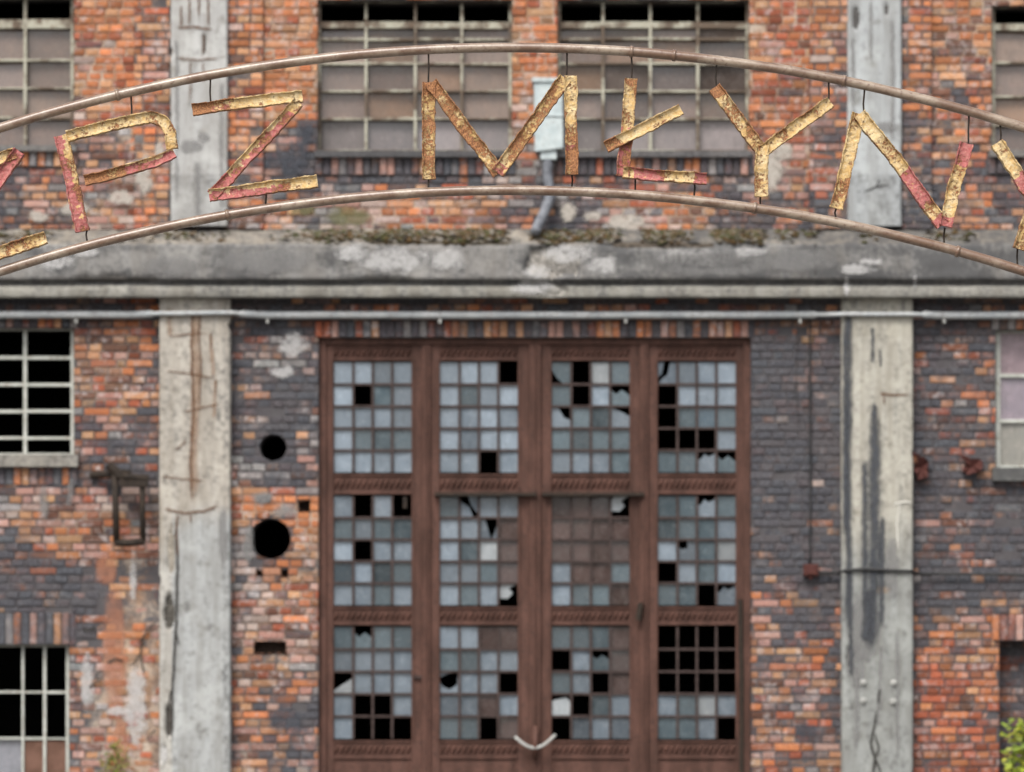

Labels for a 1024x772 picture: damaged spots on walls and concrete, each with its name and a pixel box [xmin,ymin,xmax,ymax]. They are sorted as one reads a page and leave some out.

water stain [42,249,97,268]
water stain [335,247,461,274]
water stain [514,245,614,294]
water stain [658,248,881,296]
water stain [842,316,899,747]